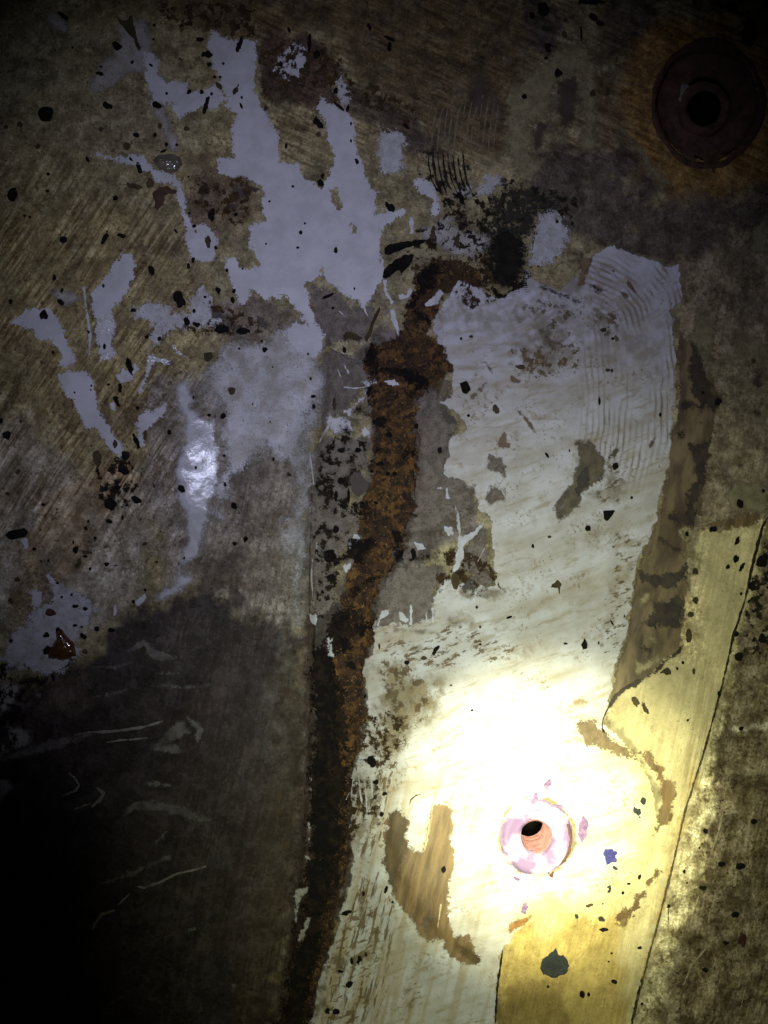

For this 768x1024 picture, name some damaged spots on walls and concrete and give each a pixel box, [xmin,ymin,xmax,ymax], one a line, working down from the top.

peeling [6,528,29,549]
peeling [0,572,99,757]
peeling [9,251,222,459]
corrosion [282,256,483,1024]
peeling [90,15,682,1024]
damp [381,803,481,965]
damp [609,318,760,708]
crack [631,517,768,1024]